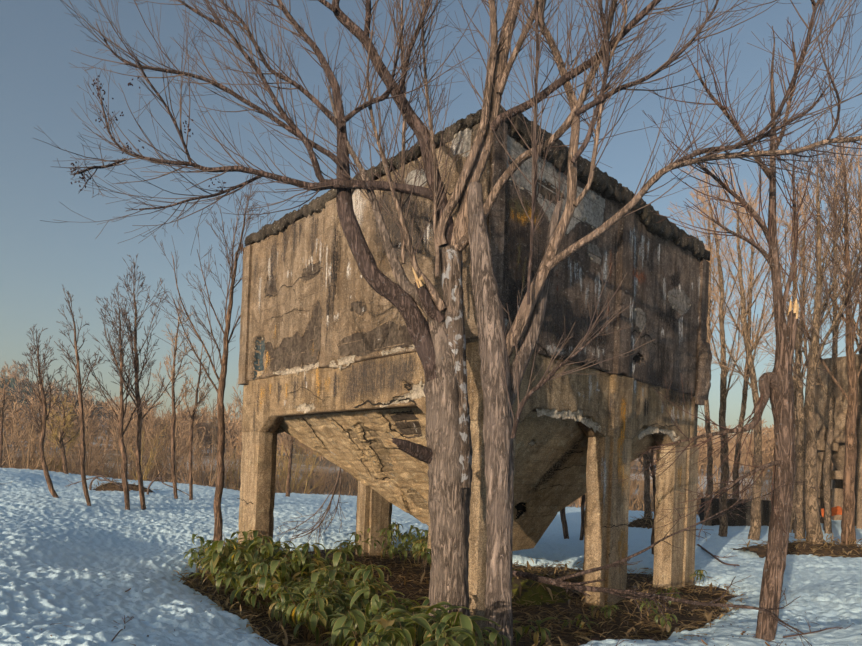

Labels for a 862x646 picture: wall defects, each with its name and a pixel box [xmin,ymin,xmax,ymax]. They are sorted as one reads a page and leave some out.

peeling [507,134,605,234]
crack [300,396,417,480]
damp [334,356,417,402]
peeling [347,381,425,479]
spalling [536,409,601,433]
spalling [638,426,679,442]
damp [632,273,700,420]